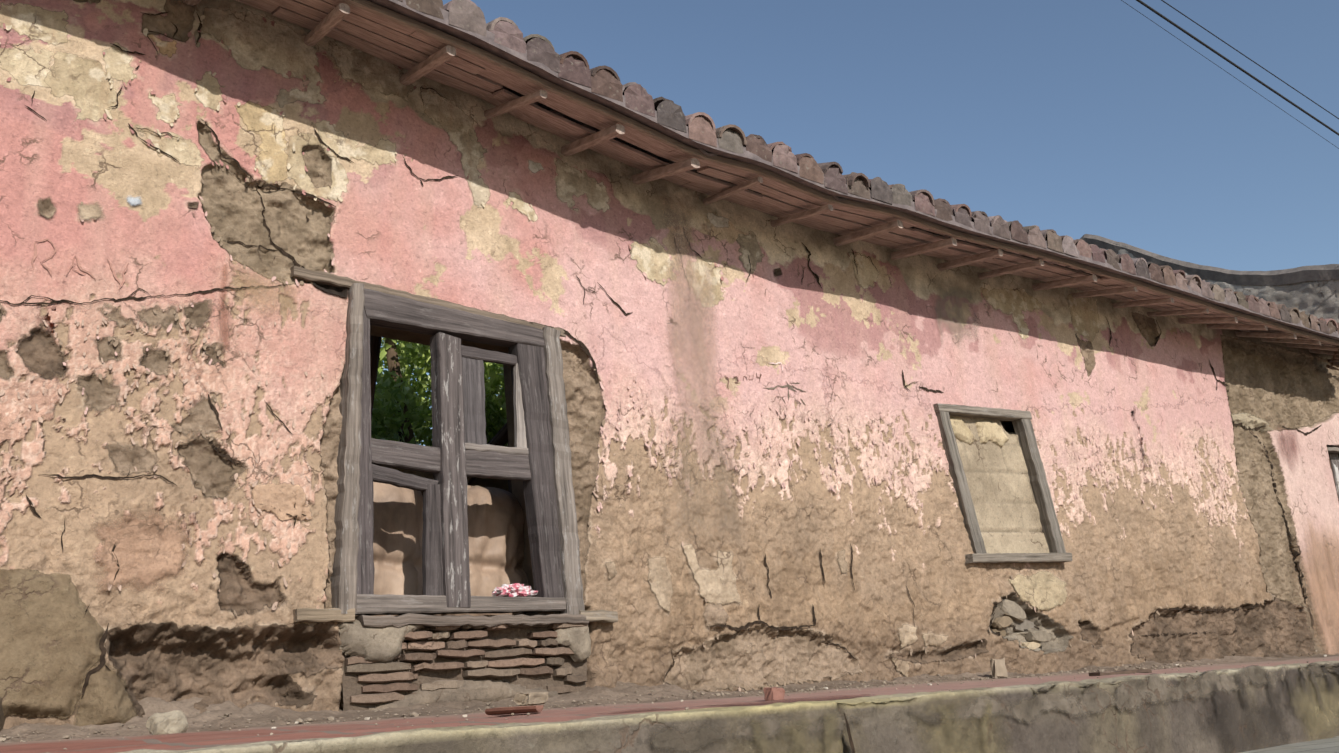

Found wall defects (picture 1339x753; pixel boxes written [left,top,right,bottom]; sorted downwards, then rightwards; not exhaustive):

peeling [195,7,490,208]
peeling [130,90,204,169]
crack [402,155,459,187]
peeling [506,191,538,221]
crack [0,284,291,305]
spalling [312,282,348,298]
crack [576,276,633,316]
peeling [629,237,724,307]
crack [902,370,944,393]
peeling [0,296,346,617]
crack [26,470,177,550]
crack [1142,604,1260,636]